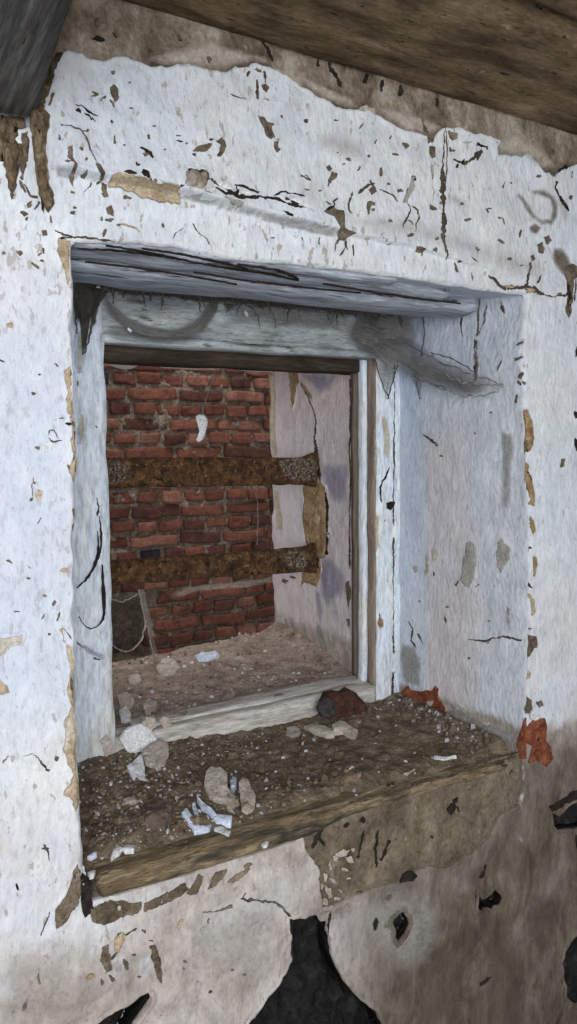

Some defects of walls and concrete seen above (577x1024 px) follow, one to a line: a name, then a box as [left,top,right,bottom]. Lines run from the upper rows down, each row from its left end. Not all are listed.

spalling [0,115,27,161]
spalling [53,0,577,281]
crack [211,178,420,229]
peeling [2,184,74,288]
crack [488,267,567,298]
crack [469,635,522,644]
spalling [246,338,553,1024]
spalling [41,594,279,1024]
crack [203,893,292,924]